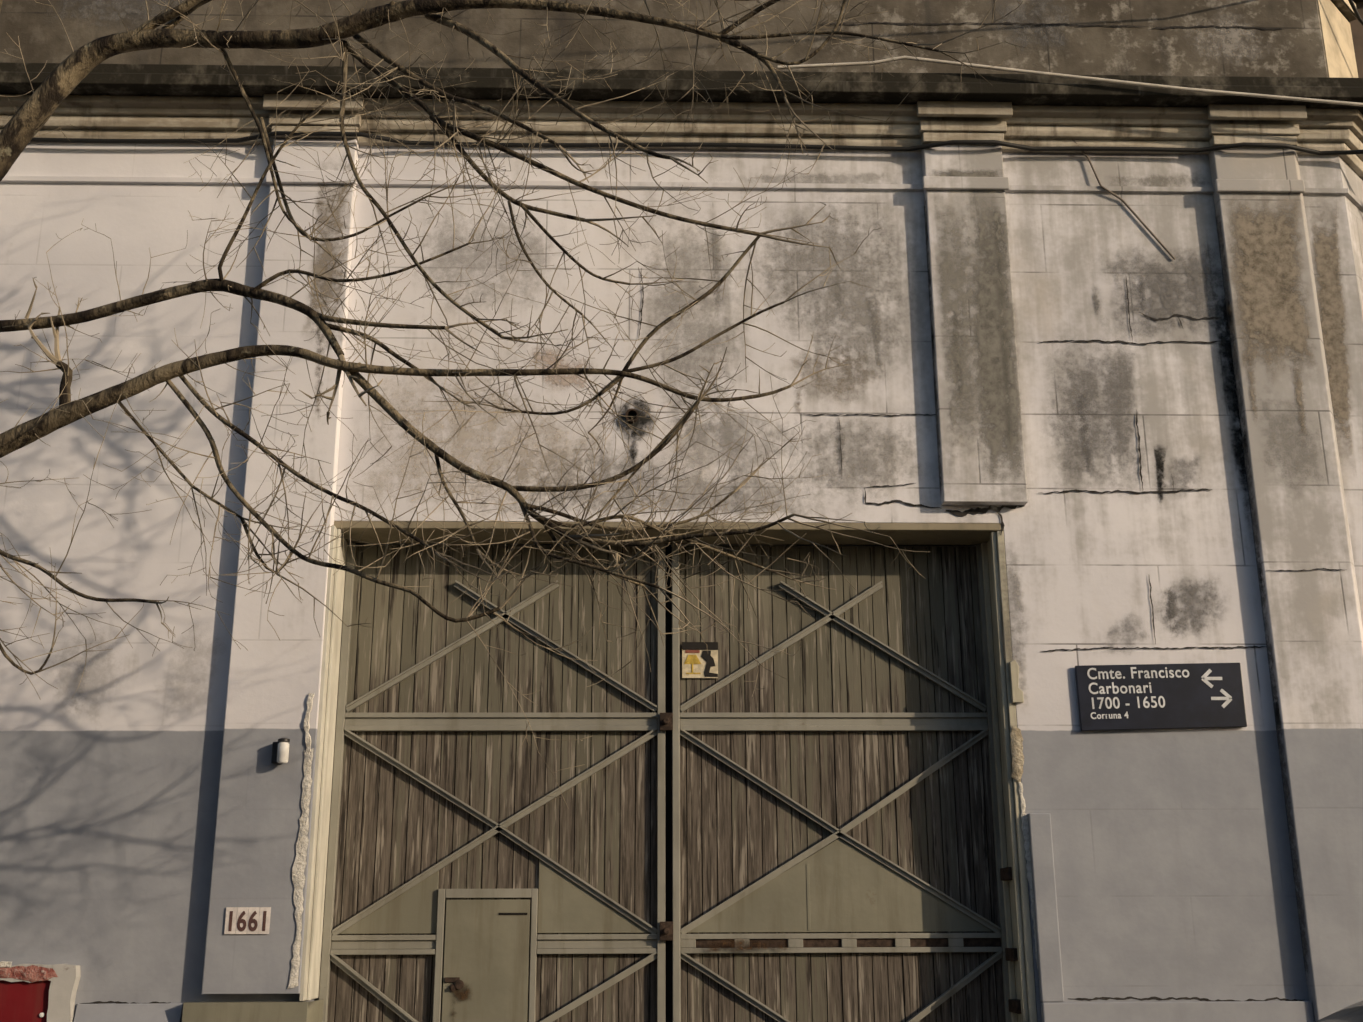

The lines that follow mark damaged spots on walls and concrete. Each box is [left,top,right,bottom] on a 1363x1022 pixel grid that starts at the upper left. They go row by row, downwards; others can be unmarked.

damp [769,220,901,397]
damp [924,201,1021,491]
crack [1039,278,1226,345]
crack [804,410,1210,535]
damp [1061,360,1133,471]
damp [1114,202,1352,972]
peeling [0,961,58,982]